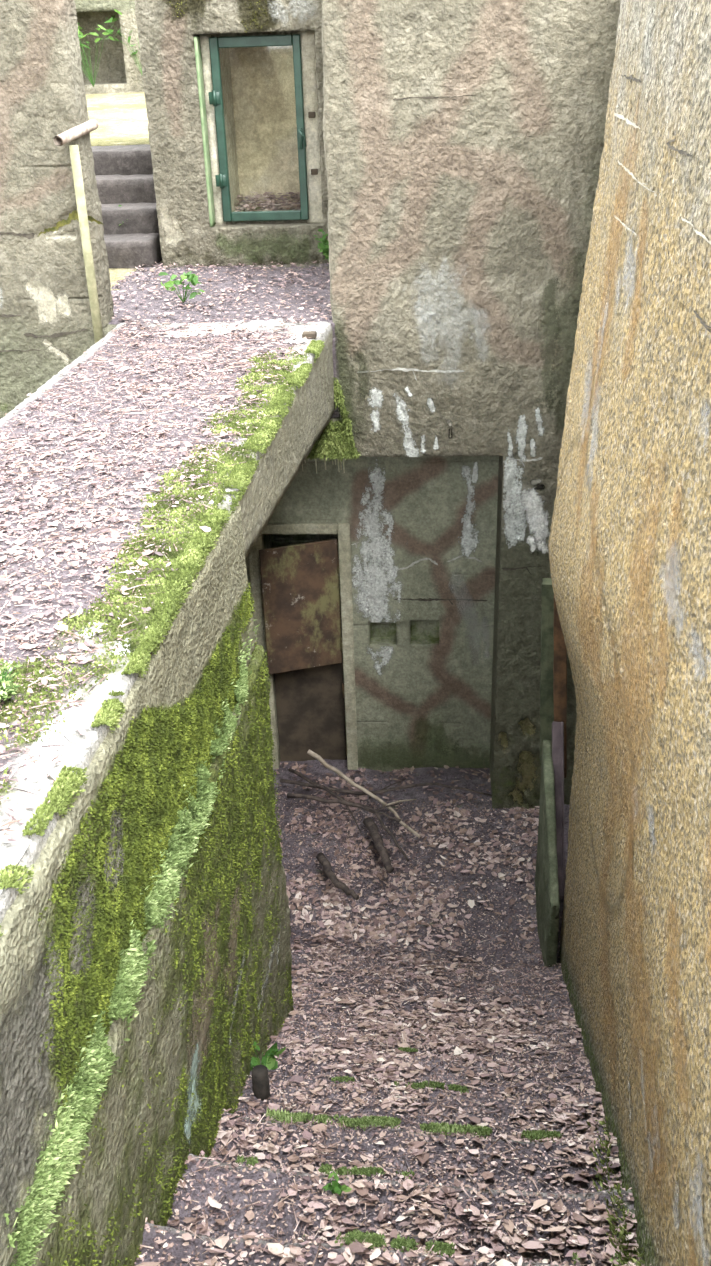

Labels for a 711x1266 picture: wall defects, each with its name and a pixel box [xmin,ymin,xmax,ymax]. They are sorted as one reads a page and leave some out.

leakage [367,387,439,457]
leakage [352,459,402,622]
leakage [460,462,480,557]
leakage [503,407,544,548]
leakage [369,646,393,676]